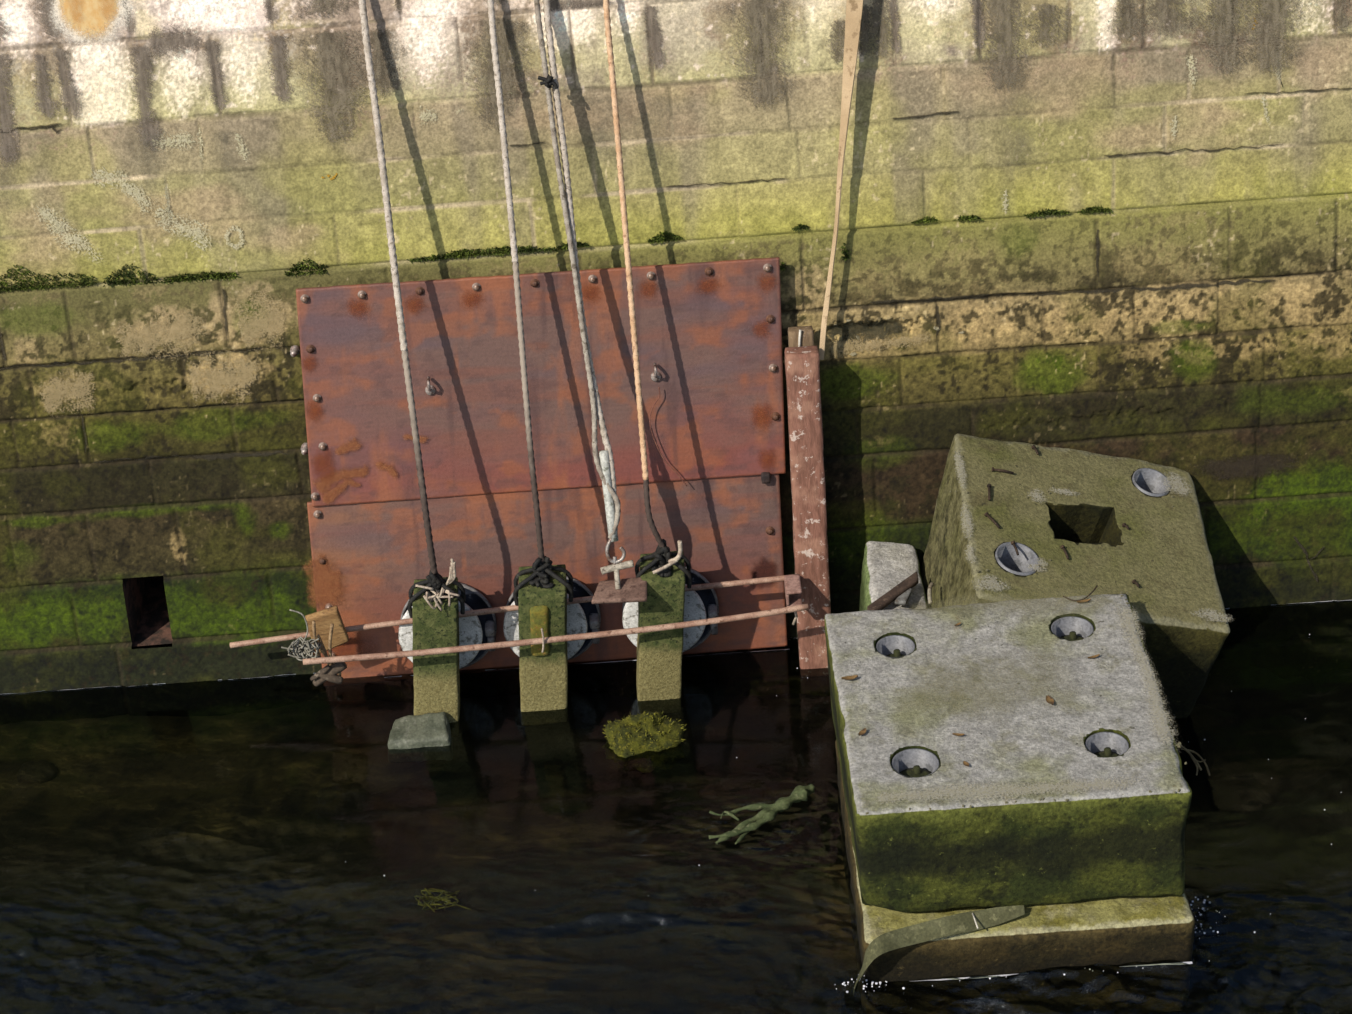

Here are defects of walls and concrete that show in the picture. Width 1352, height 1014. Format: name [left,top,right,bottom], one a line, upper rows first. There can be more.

water stain [32,0,83,117]
water stain [121,0,229,162]
water stain [263,0,405,143]
water stain [725,0,795,108]
water stain [826,0,901,63]
water stain [969,0,1072,91]
water stain [1105,0,1313,89]
crack [1246,73,1352,95]
crack [1105,144,1281,158]
corrosion [305,556,341,608]
corrosion [752,559,775,587]
corrosion [328,634,360,656]